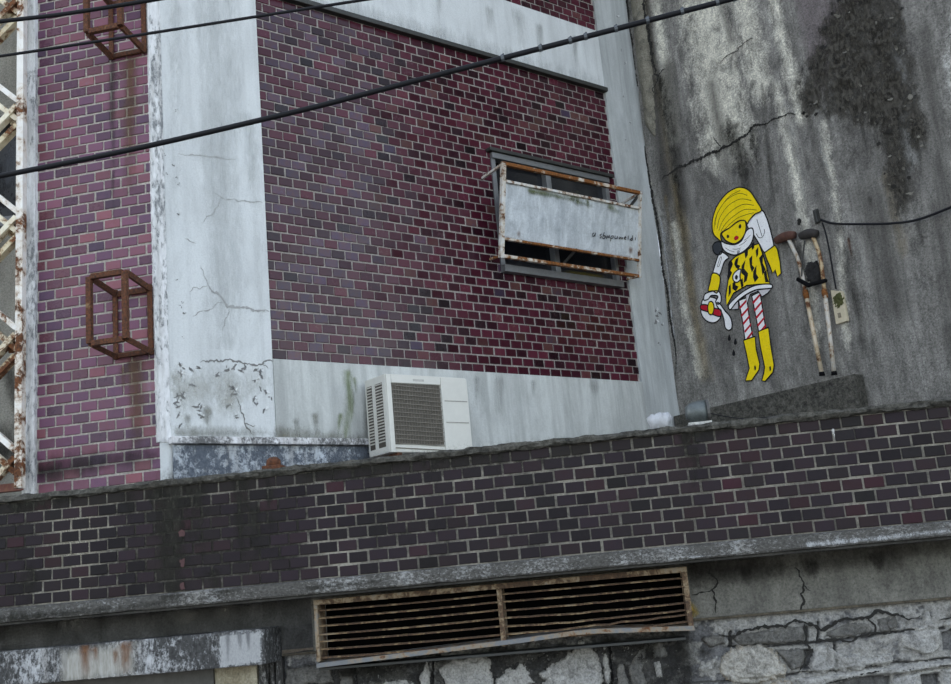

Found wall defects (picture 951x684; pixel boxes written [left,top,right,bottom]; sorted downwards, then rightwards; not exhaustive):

crack [662,112,796,179]
crack [185,193,263,243]
crack [190,268,269,331]
peeling [173,362,205,429]
peeling [215,363,272,413]
crack [693,566,718,613]
crack [720,567,951,671]
crack [826,665,948,684]